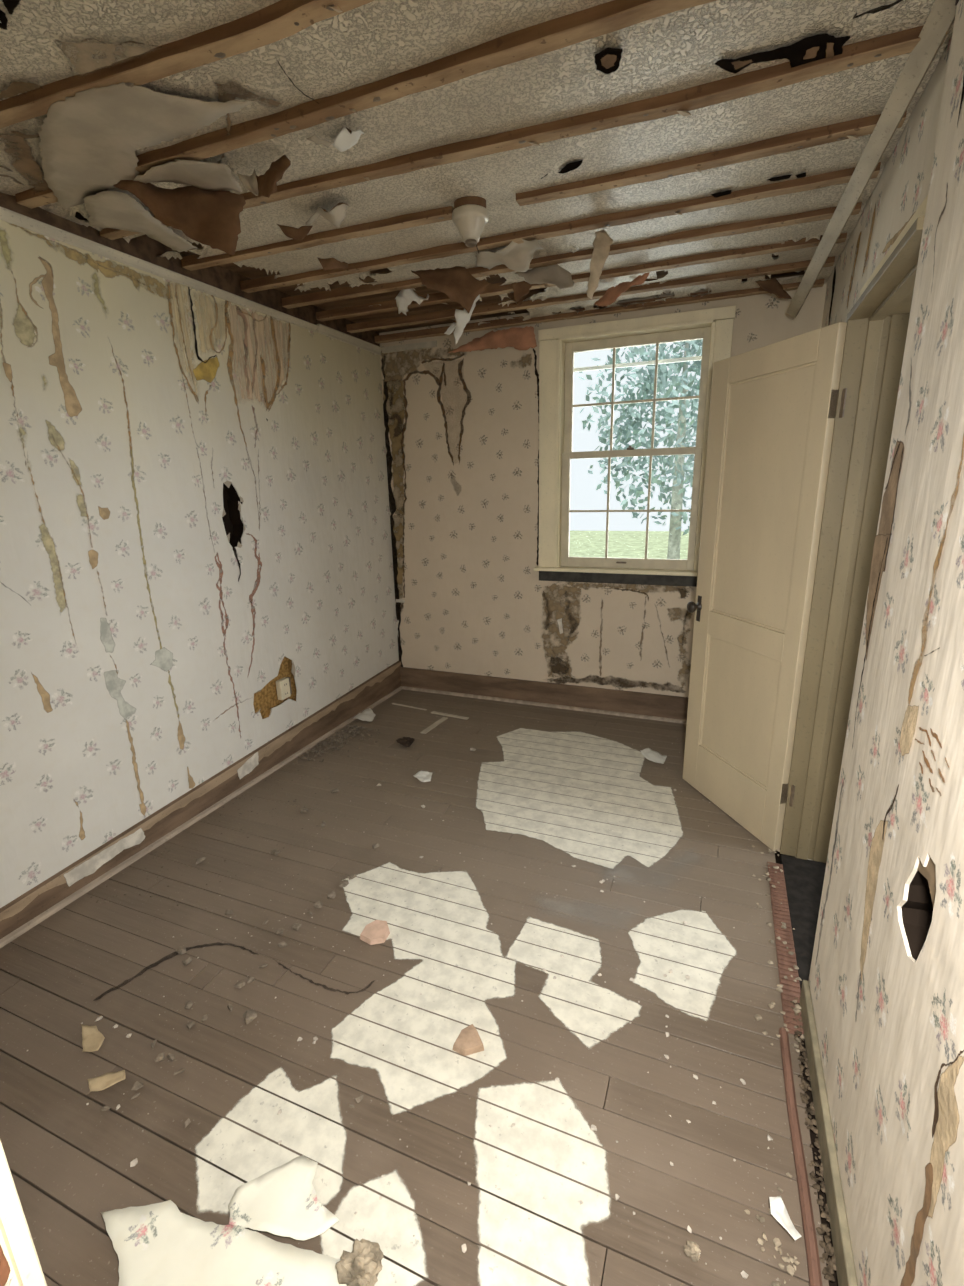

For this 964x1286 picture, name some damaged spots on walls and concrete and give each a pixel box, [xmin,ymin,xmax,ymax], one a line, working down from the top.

damp [0,224,291,447]
damp [28,467,75,638]
damp [46,420,146,816]
damp [111,345,185,749]
spalling [222,481,245,548]
spalling [253,656,297,719]
spalling [901,857,936,960]